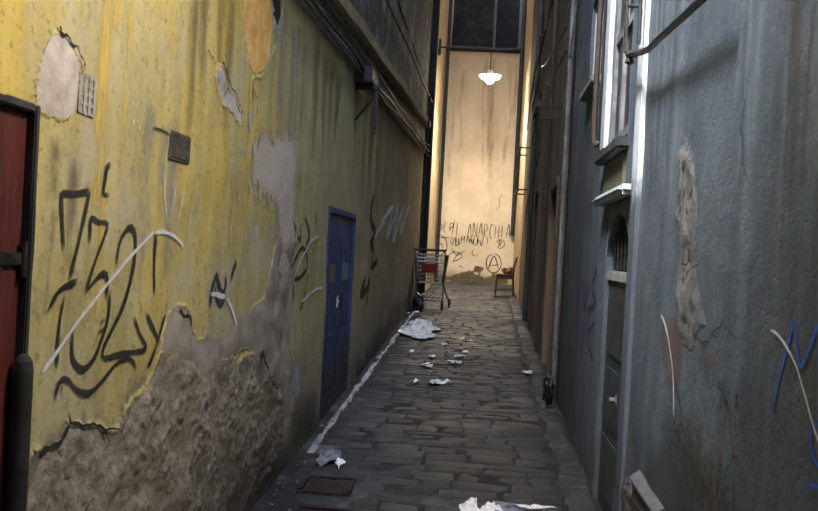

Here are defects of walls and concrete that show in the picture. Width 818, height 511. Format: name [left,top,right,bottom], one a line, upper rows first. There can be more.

peeling [34,28,80,124]
peeling [243,0,285,86]
spalling [27,61,300,511]
spalling [675,138,706,352]